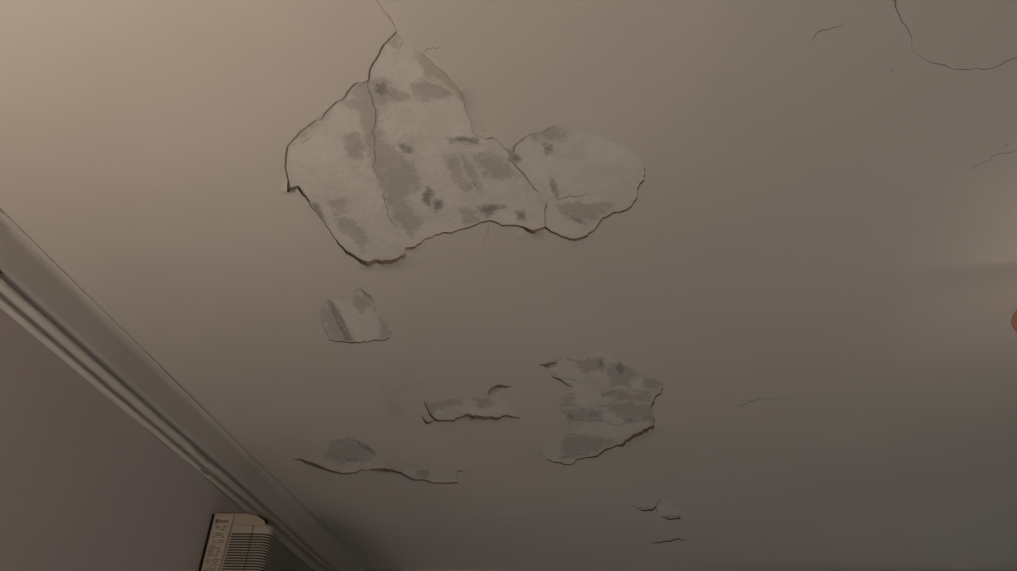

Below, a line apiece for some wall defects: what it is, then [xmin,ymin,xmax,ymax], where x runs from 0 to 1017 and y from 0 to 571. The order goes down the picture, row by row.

crack [894,0,1017,70]
peeling [321,287,396,347]
peeling [416,385,520,427]
peeling [292,436,469,488]